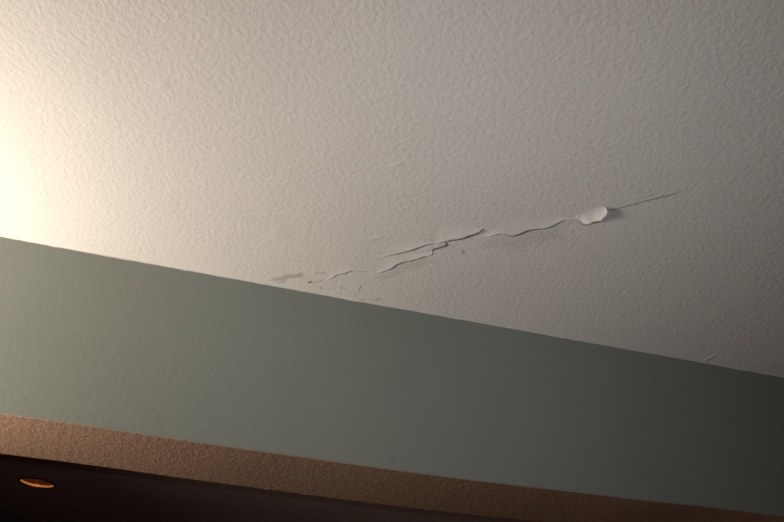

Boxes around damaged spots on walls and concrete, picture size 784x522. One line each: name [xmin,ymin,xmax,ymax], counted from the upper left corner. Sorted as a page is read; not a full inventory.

peeling [325,206,608,281]